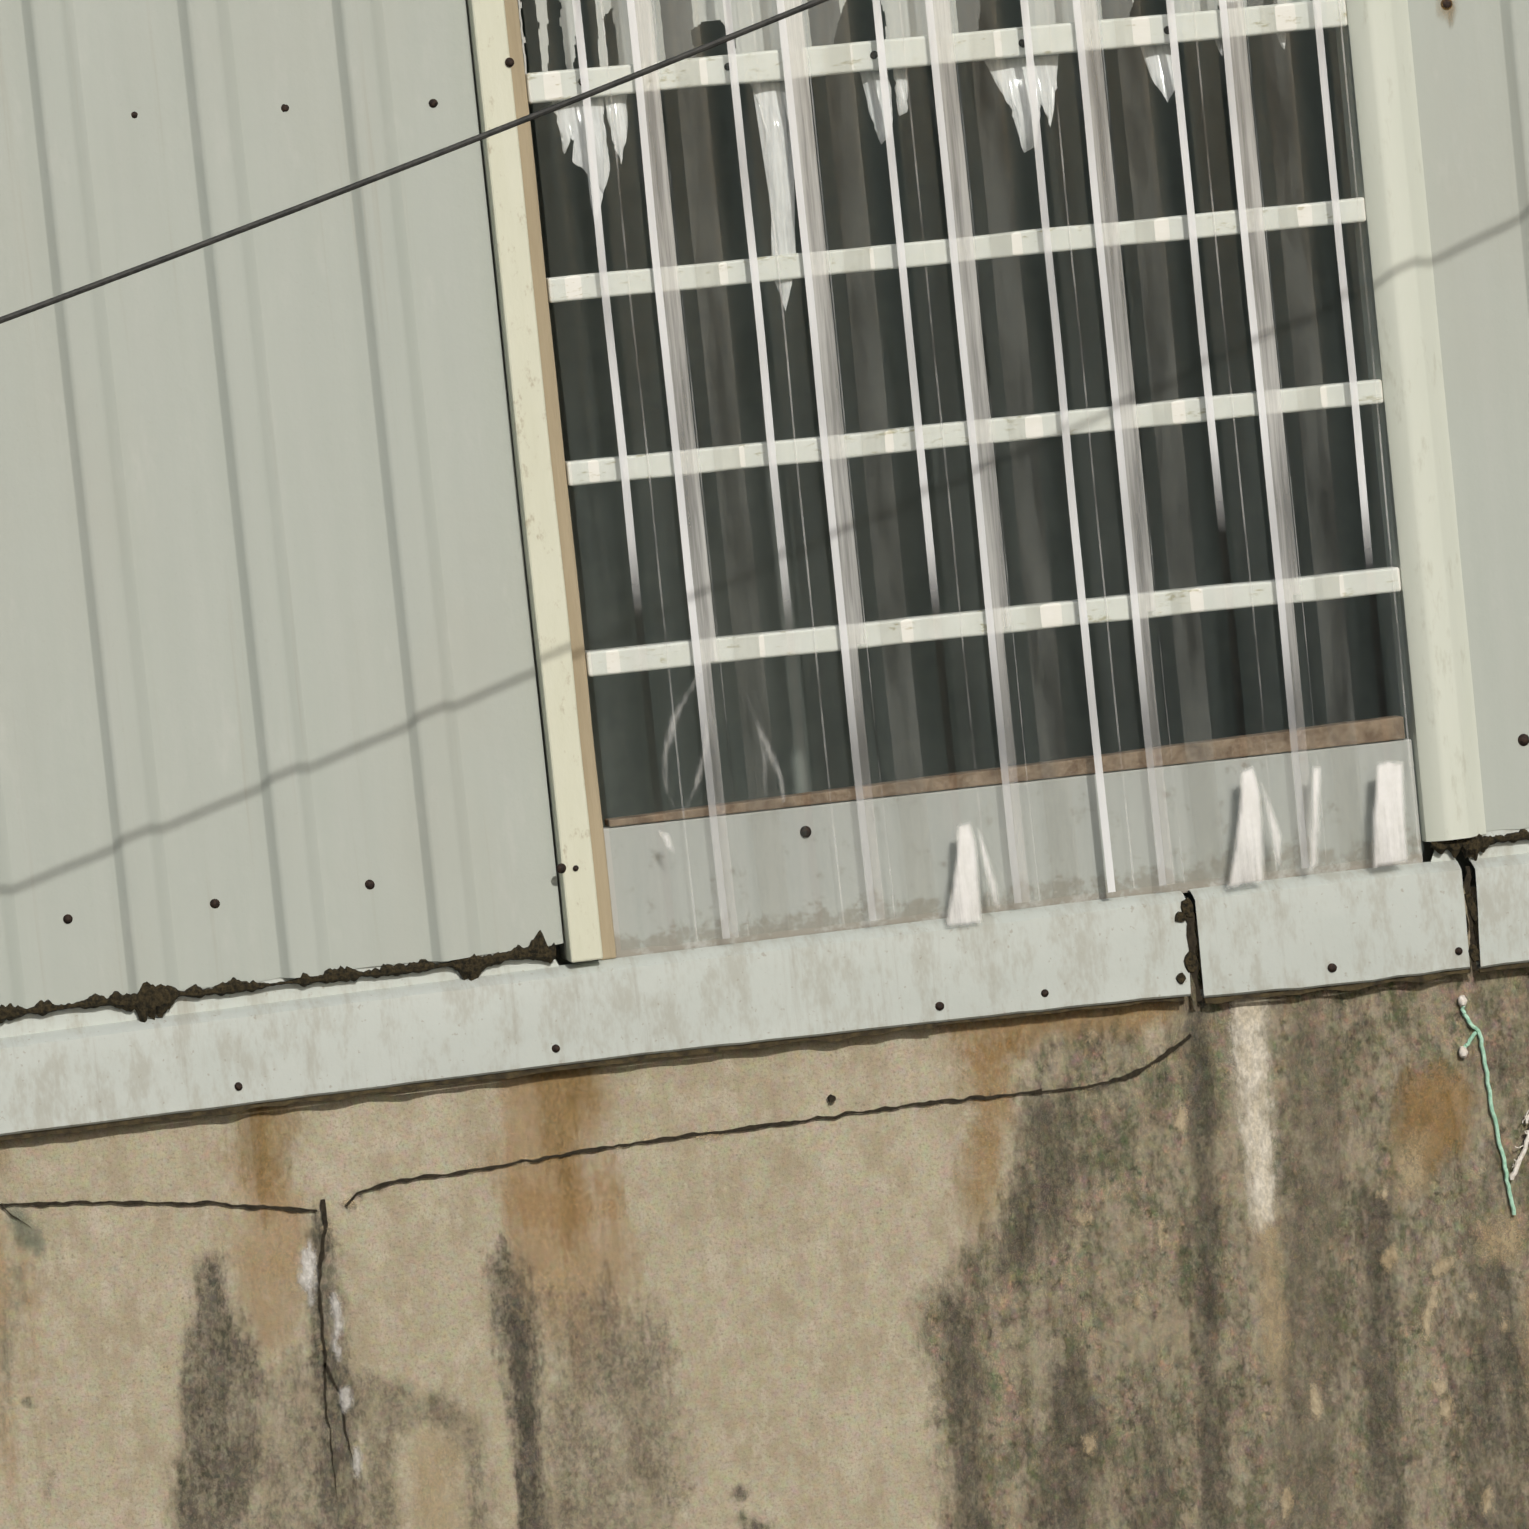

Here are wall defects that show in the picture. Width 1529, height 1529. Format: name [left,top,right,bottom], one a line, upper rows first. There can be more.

water stain [177,1214,405,1529]
water stain [492,1249,676,1529]
crack [0,1034,1192,1500]
water stain [736,1486,767,1529]
water stain [923,962,1529,1529]